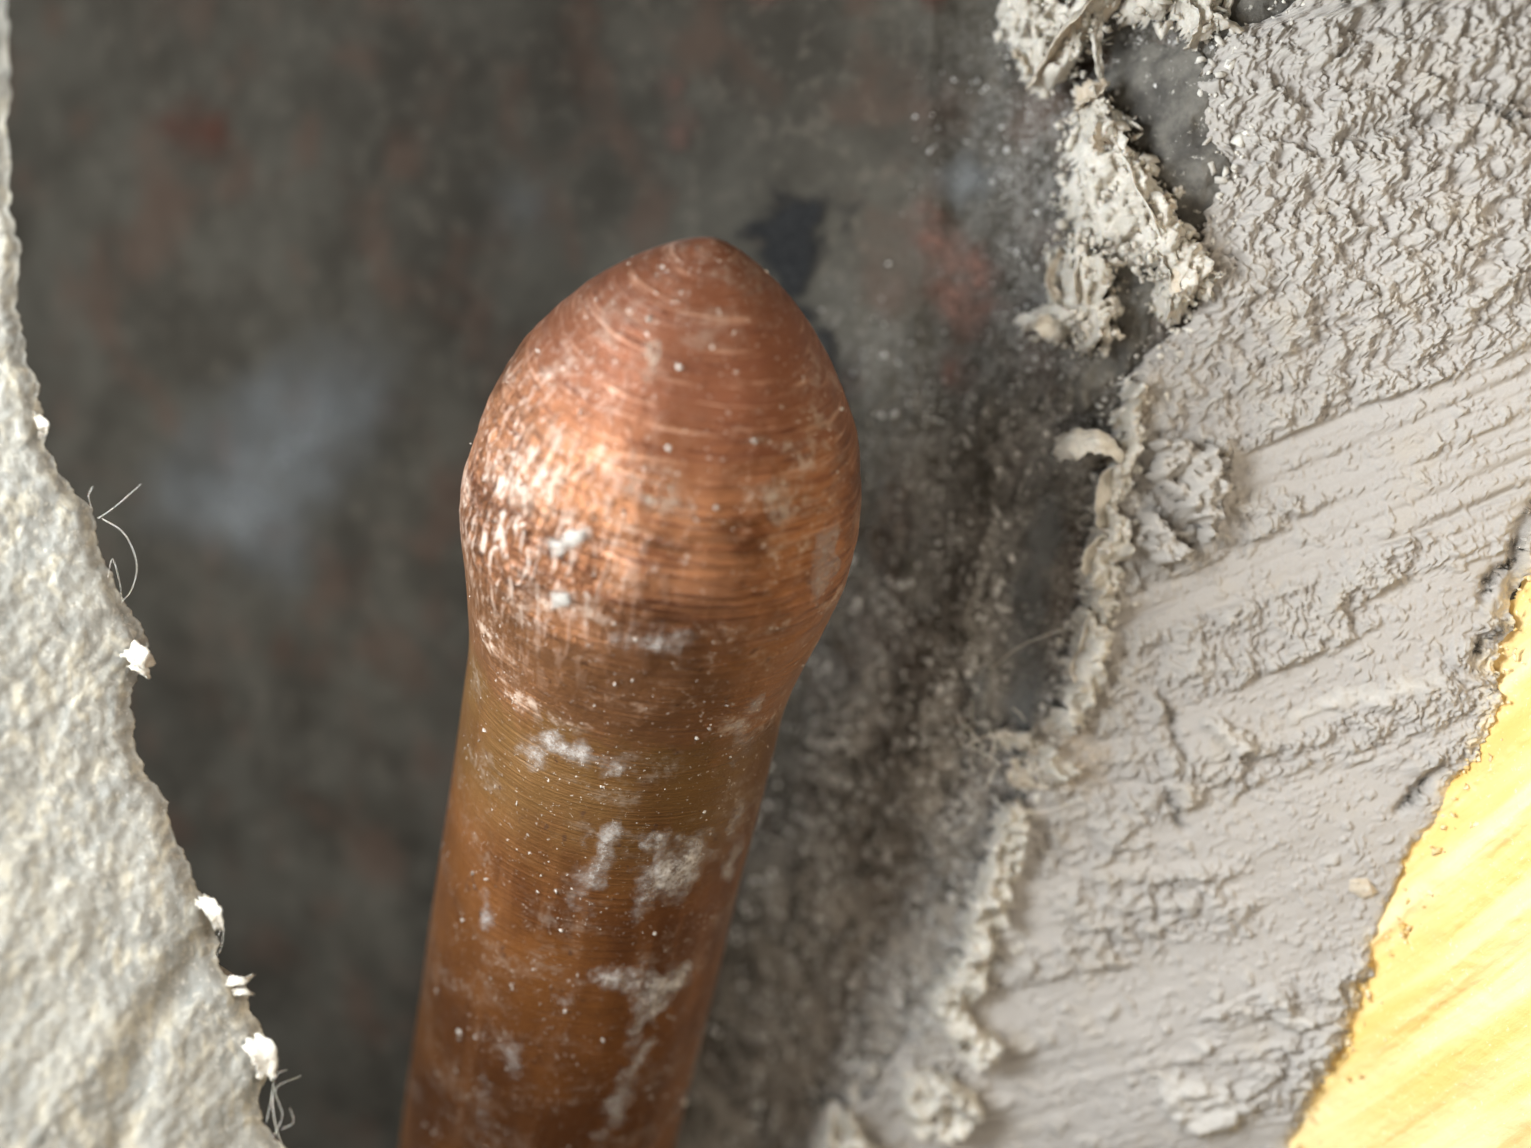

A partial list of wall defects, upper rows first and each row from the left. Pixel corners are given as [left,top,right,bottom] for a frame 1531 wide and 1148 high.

flaking render [995,0,1296,736]
peeling [1349,878,1378,899]